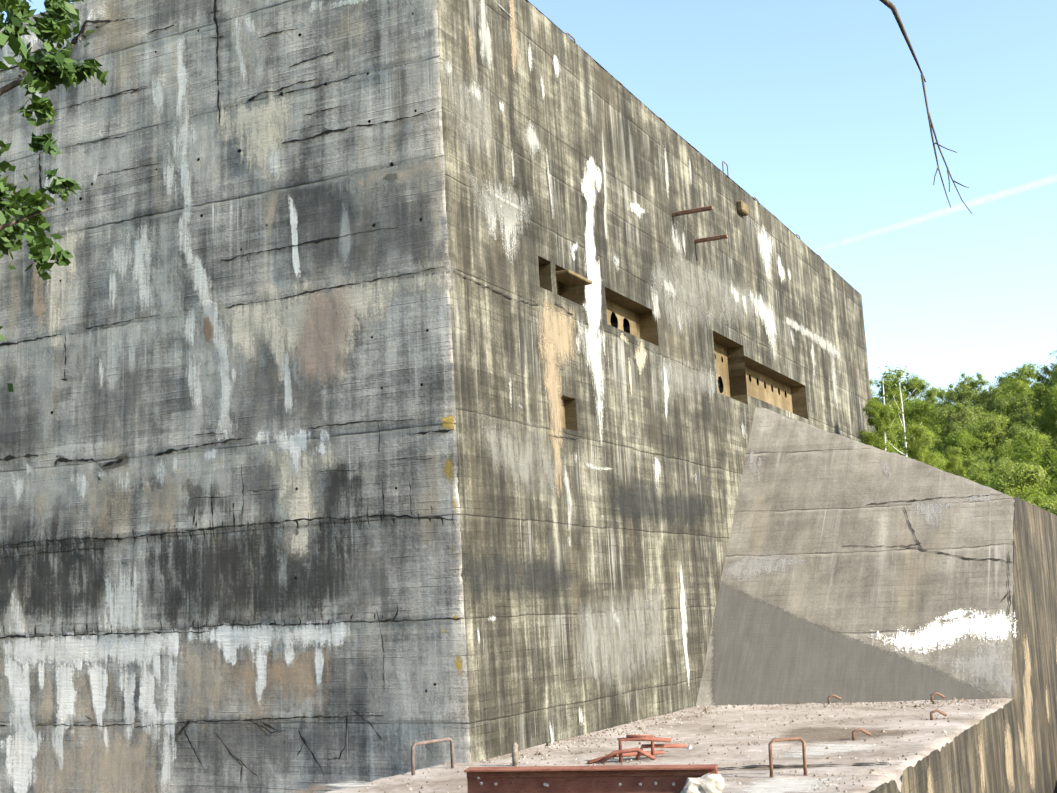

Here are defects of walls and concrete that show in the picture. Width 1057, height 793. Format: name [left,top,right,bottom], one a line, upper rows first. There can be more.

water stain [0,7,105,71]
crack [0,18,174,72]
crack [54,86,147,111]
crack [211,0,225,124]
water stain [231,16,263,81]
crack [247,52,436,144]
crack [0,315,158,381]
water stain [0,36,454,557]
water stain [570,135,607,440]
crack [843,493,1012,616]
water stain [0,550,387,793]
water stain [710,556,1035,793]